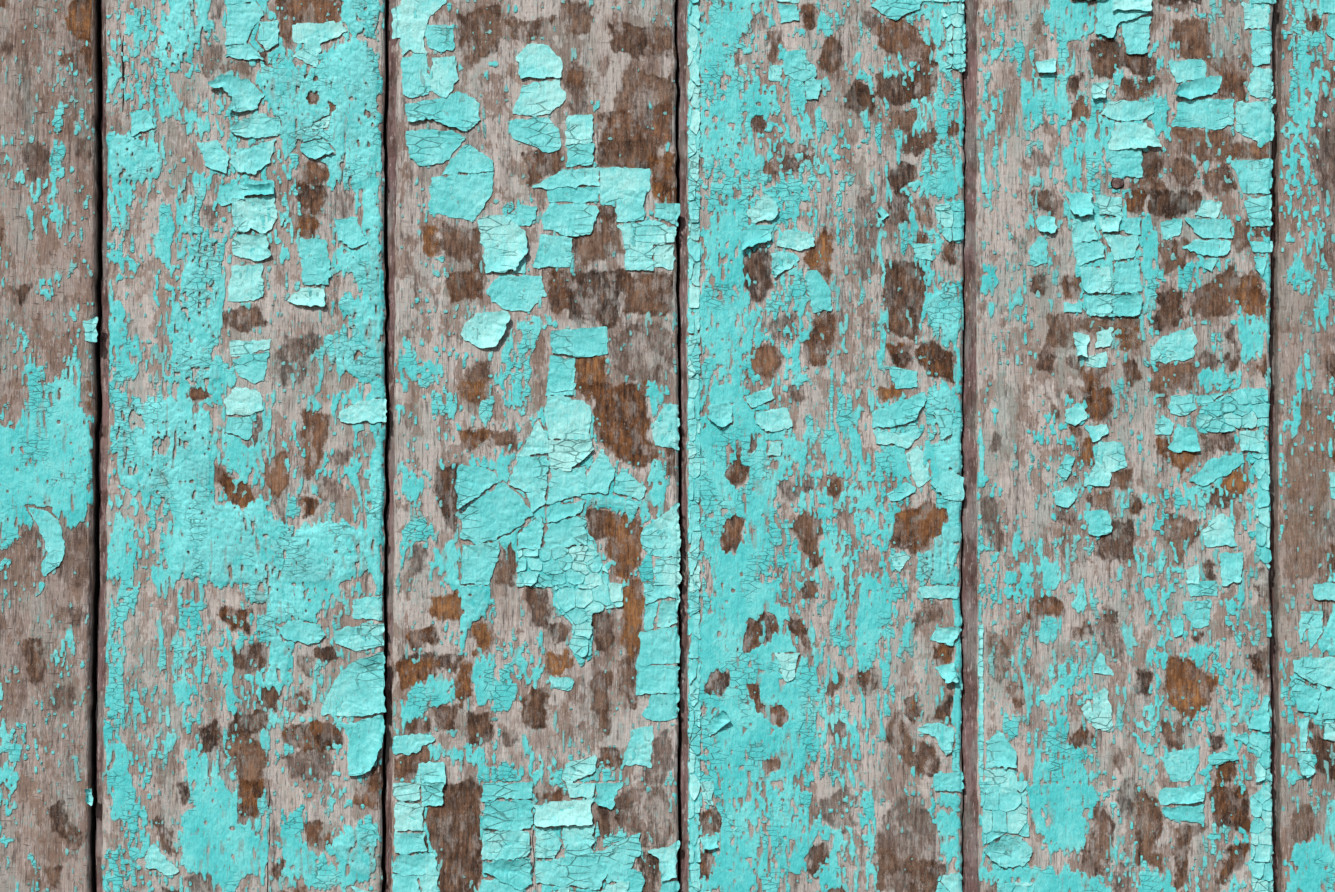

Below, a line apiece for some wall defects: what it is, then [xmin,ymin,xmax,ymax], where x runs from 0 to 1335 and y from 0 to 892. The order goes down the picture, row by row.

peeling [0,0,966,892]
peeling [976,0,1335,892]